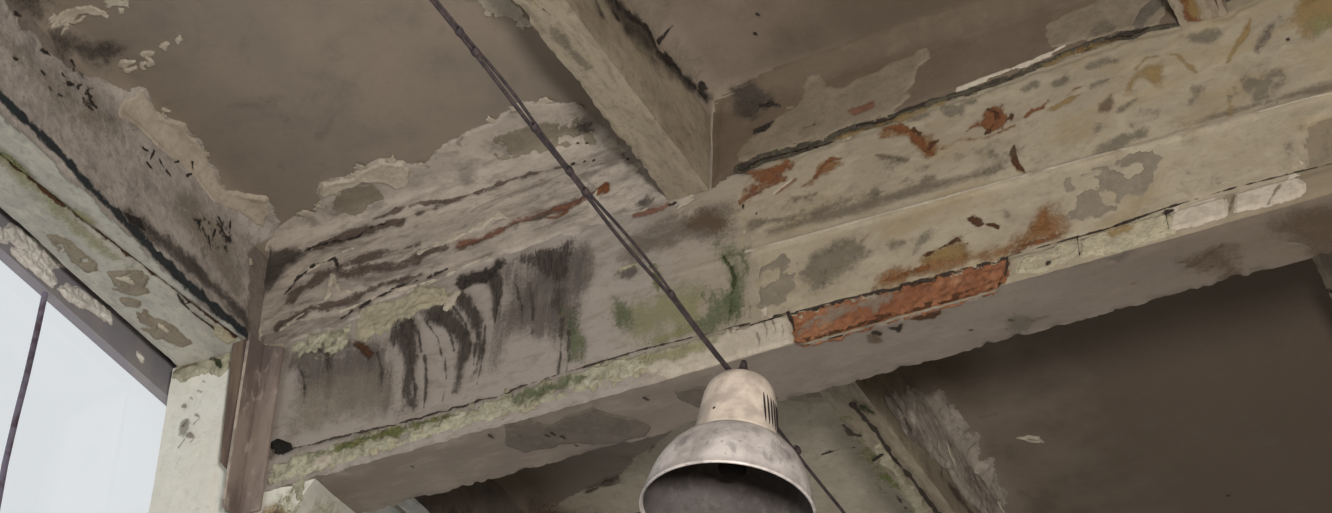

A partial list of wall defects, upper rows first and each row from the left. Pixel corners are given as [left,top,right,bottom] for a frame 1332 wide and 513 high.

leakage [40,29,121,110]
leakage [0,91,248,338]
peeling [0,0,695,348]
leakage [596,0,710,103]
rust [738,157,842,214]
rust [880,123,943,157]
rust [1009,145,1025,172]
rust [968,87,1080,140]
spalling [1055,150,1307,258]
spalling [756,253,1011,347]
peeling [172,352,232,416]
leakage [268,241,647,486]